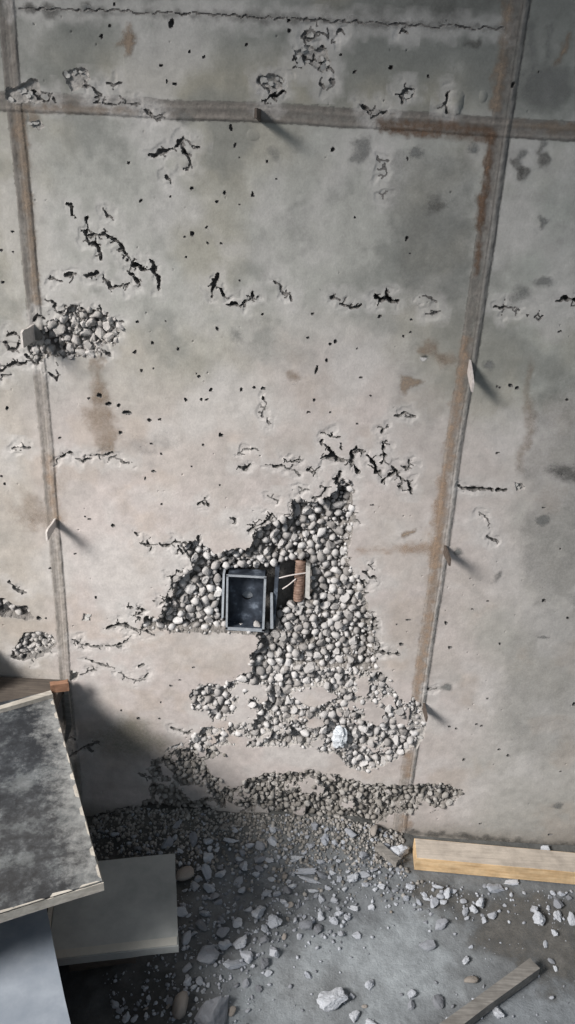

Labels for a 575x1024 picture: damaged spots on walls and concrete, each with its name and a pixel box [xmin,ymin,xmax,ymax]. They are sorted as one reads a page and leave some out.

crack [18,7,504,105]
spalling [294,45,331,73]
crack [81,80,200,184]
corrosion [379,121,495,270]
flaking render [30,306,124,361]
crack [0,202,161,382]
crack [208,272,293,308]
crack [329,288,441,316]
crack [197,411,416,532]
flaking render [14,631,56,658]
crack [7,532,200,684]
flaking render [139,478,464,823]